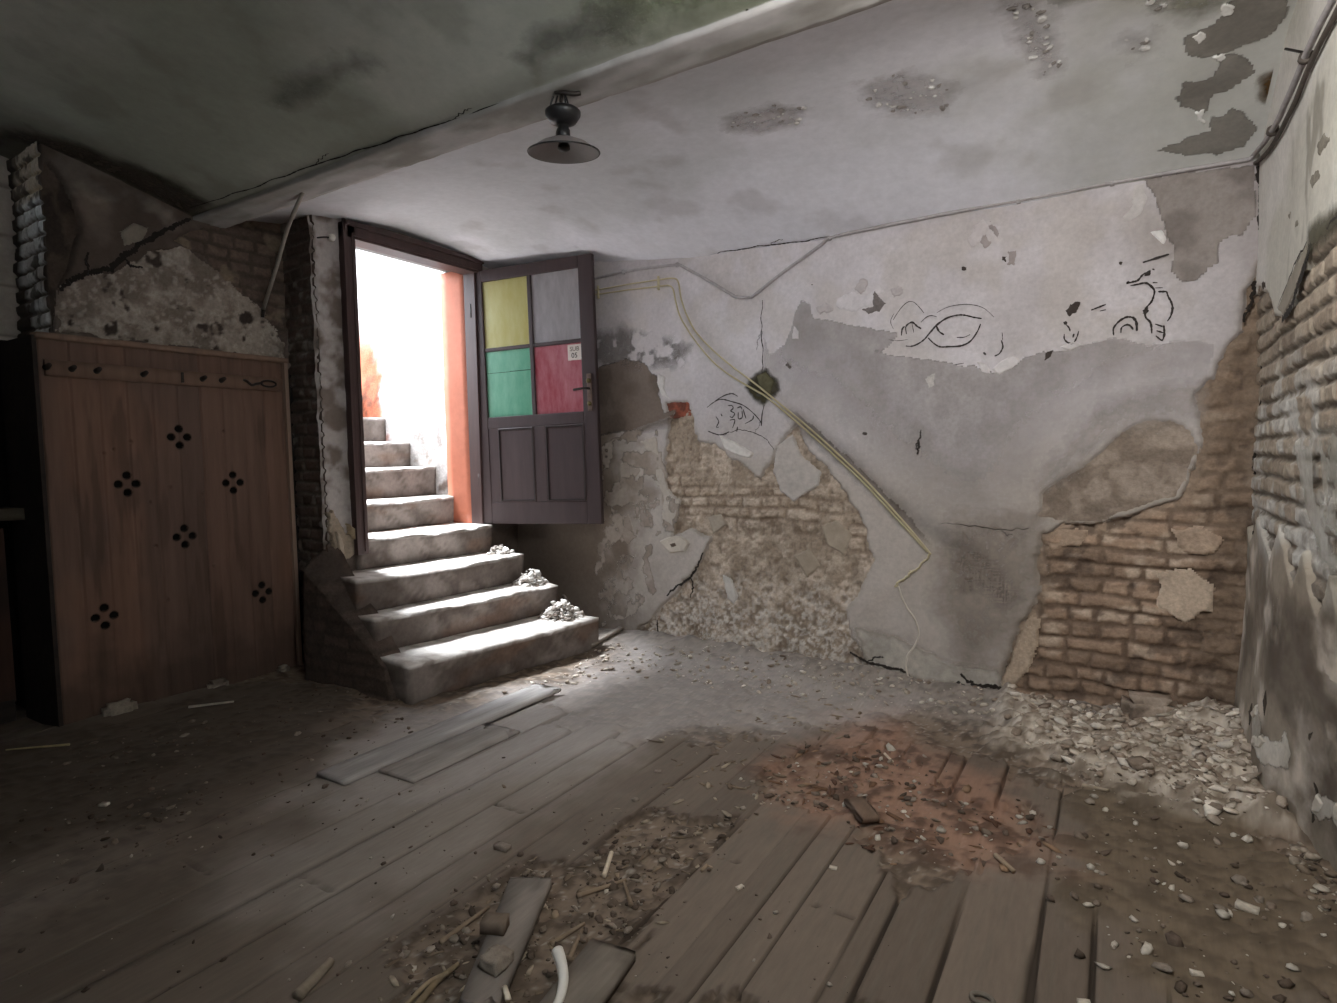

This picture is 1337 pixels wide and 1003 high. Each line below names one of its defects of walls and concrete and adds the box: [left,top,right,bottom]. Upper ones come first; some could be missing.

flaking render [40,163,288,358]
crack [59,103,498,291]
peeling [1123,0,1289,282]
flaking render [1310,133,1330,189]
flaking render [595,358,875,665]
flaking render [1000,228,1337,769]
peeling [1311,783,1337,826]